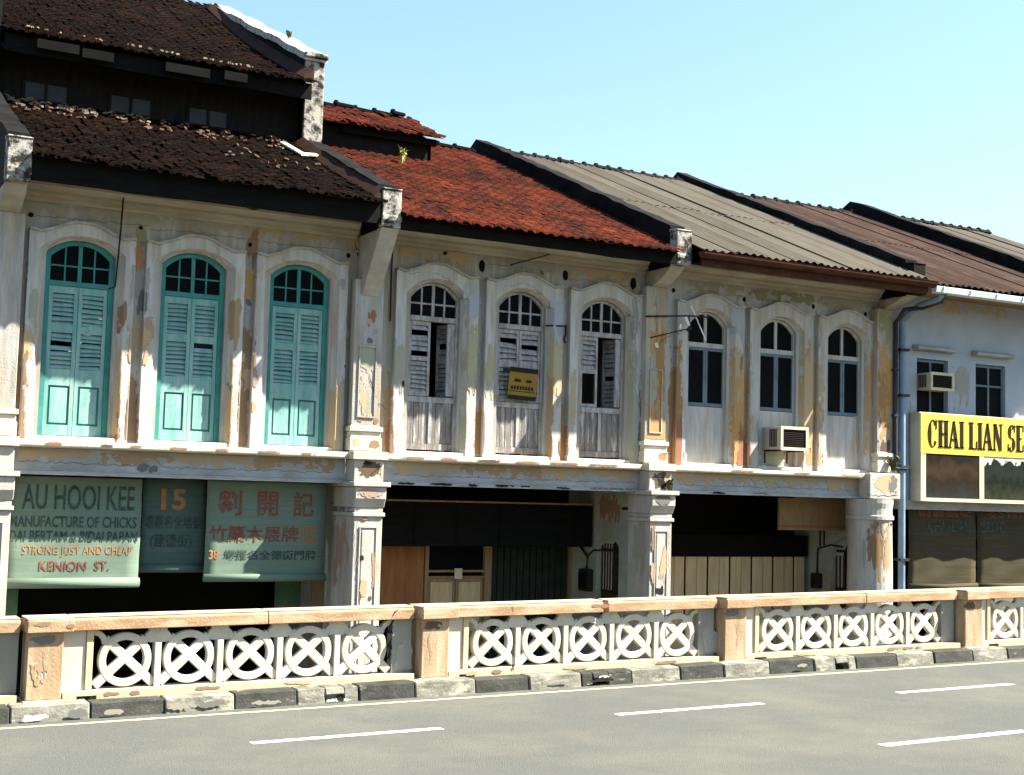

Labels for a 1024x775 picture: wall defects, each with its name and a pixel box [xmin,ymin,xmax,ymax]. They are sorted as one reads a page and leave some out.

peeling [117,265,154,365]
peeling [228,298,259,412]